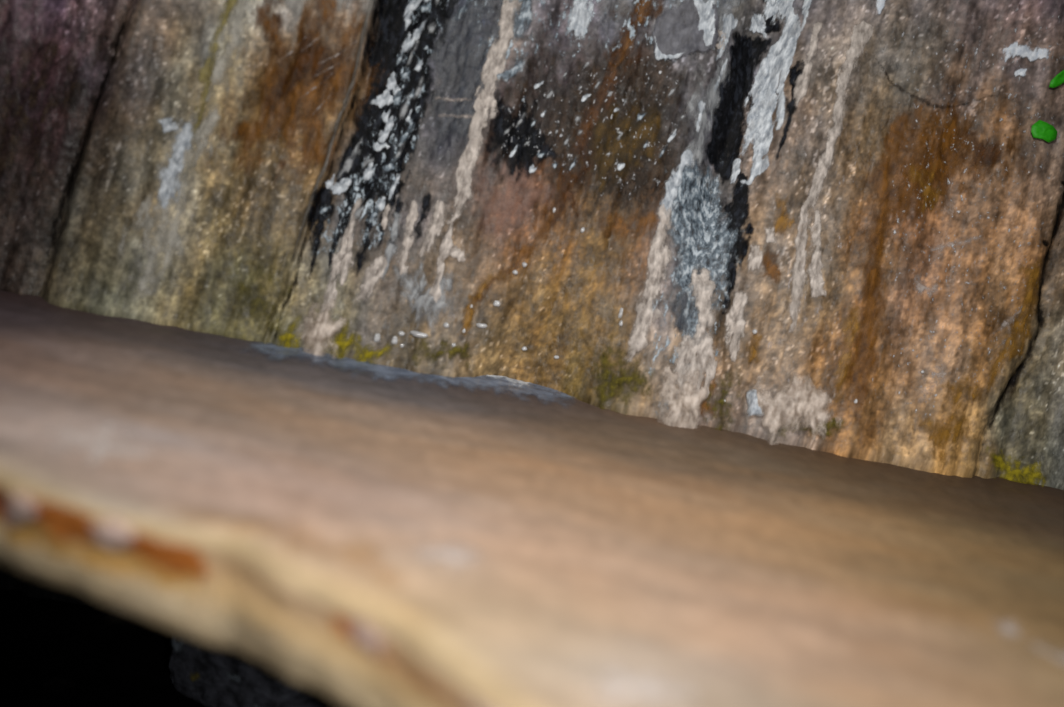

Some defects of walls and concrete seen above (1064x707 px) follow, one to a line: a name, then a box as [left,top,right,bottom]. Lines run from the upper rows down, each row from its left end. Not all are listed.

corrosion [221,0,361,169]
damp [309,173,373,313]
damp [357,0,556,348]
damp [568,0,594,39]
damp [613,0,822,397]
damp [789,20,873,332]
corrosion [835,103,1025,409]
corrosion [920,267,1040,460]
crack [989,181,1064,428]
corrosion [0,490,207,586]